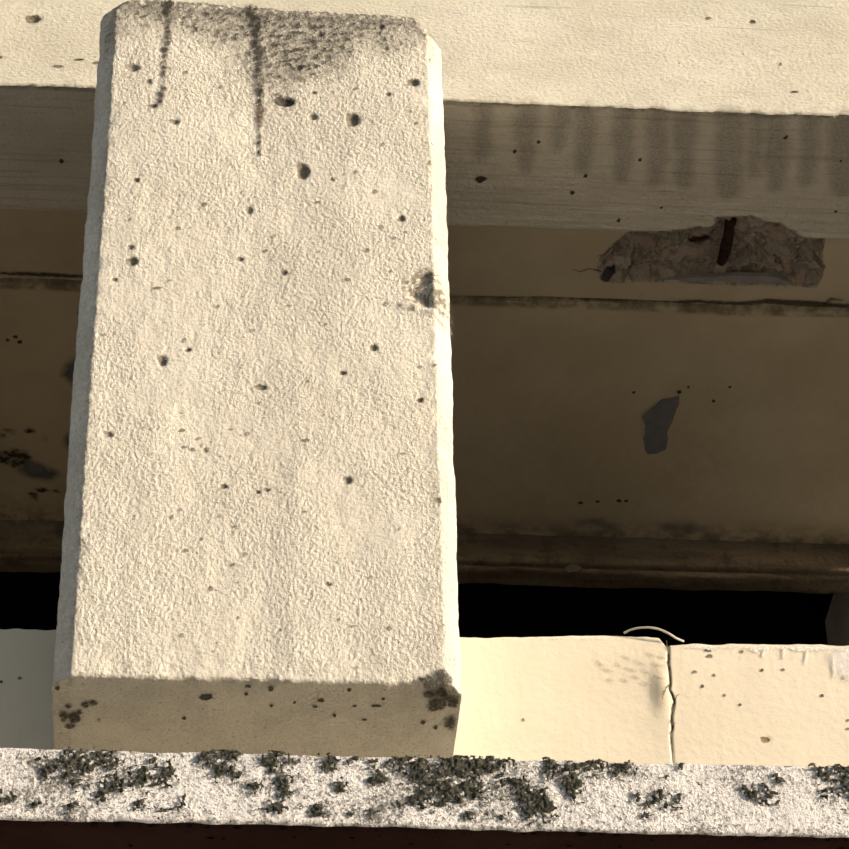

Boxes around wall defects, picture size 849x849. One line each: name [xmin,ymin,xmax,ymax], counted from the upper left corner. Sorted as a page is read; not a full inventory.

damp [159,0,174,104]
damp [245,4,264,156]
spalling [576,215,826,288]
damp [0,449,31,467]
peeling [643,386,690,454]
crack [663,641,679,748]